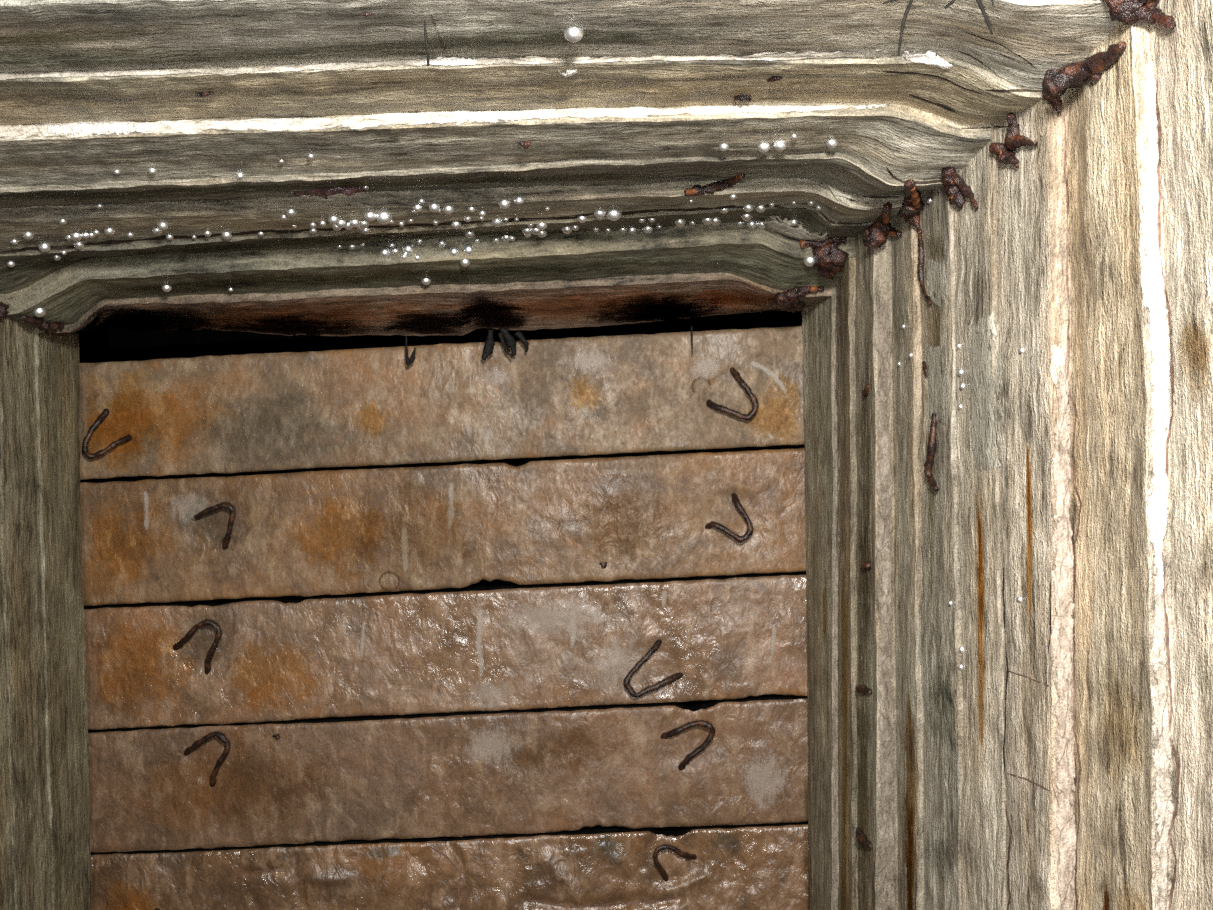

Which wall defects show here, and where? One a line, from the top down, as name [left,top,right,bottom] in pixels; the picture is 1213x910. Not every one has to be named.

leakage [71,297,526,338]
leakage [587,295,730,323]